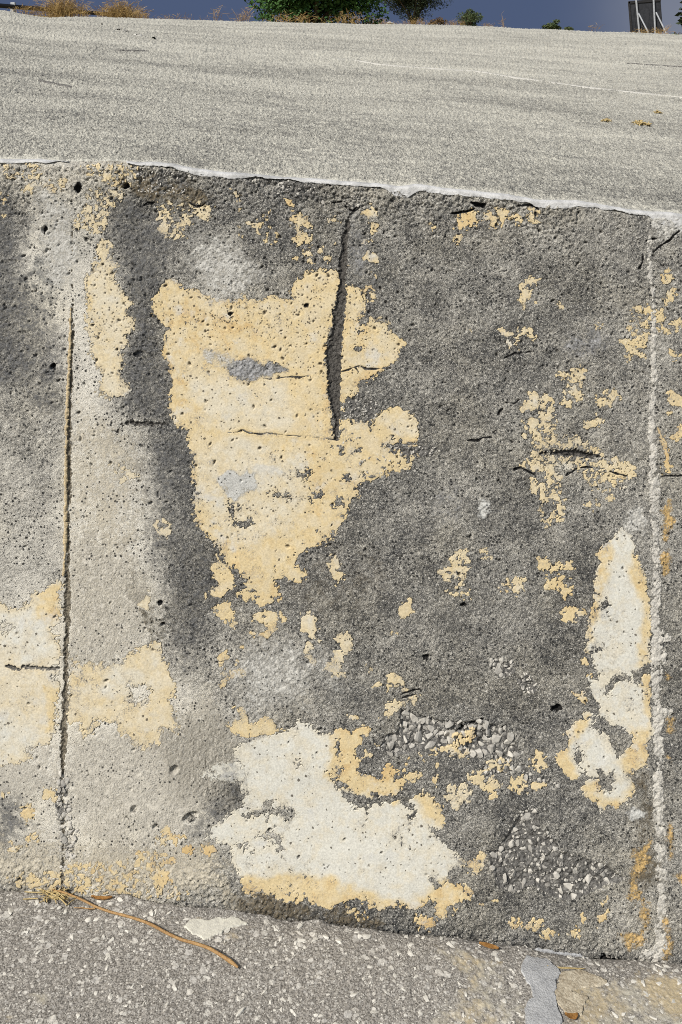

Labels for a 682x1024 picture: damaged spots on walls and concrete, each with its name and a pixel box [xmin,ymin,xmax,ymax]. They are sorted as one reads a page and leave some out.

peeling [151,177,436,689]
crack [324,201,392,441]
peeling [519,364,637,529]
peeling [0,527,655,1024]
spalling [517,945,682,1020]